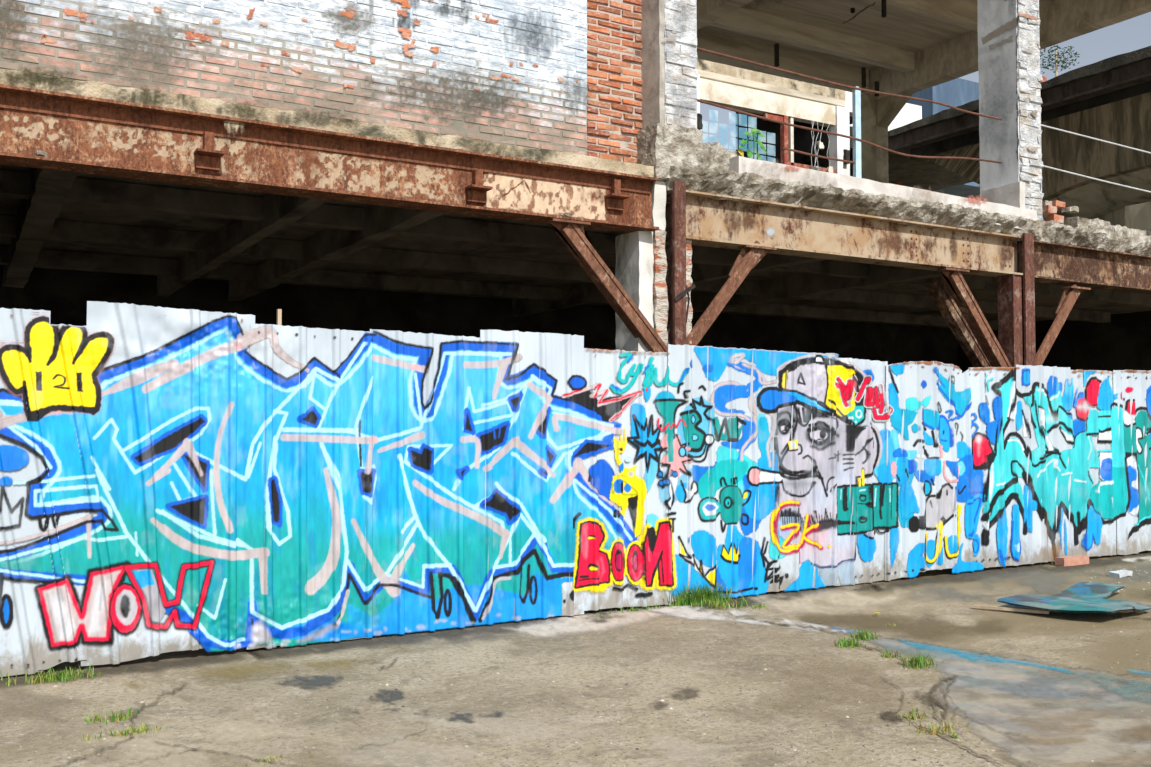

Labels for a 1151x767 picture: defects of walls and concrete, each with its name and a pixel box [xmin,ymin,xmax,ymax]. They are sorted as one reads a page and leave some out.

peeling [64,7,94,22]
peeling [185,19,229,47]
peeling [334,39,358,51]
spalling [392,0,420,57]
spalling [982,13,1038,52]
leakage [110,88,172,105]
leakage [389,72,513,117]
flaking render [558,0,643,164]
corrosion [698,197,761,237]
corrosion [880,223,906,250]
spalling [664,163,1151,256]
corrosion [1001,239,1013,268]